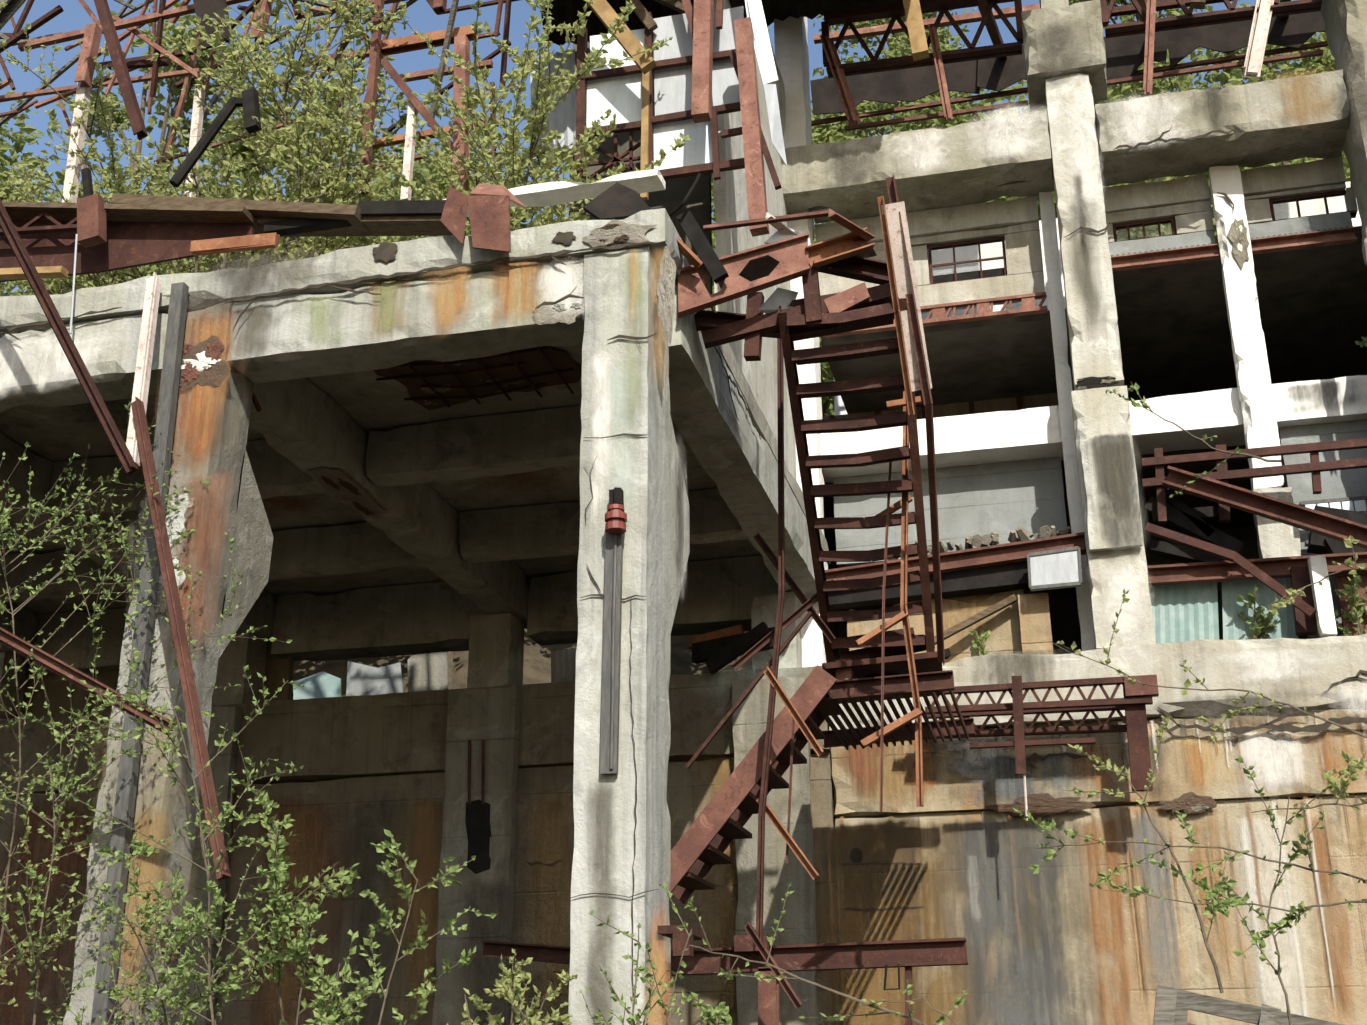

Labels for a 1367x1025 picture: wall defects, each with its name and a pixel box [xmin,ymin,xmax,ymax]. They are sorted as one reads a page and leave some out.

crack [1113,126,1234,150]
spalling [1227,218,1249,269]
spalling [551,219,676,345]
spalling [532,302,584,325]
spalling [178,335,231,394]
rust [847,739,935,796]
spalling [983,793,1096,816]
spalling [1159,791,1217,814]
rust [1306,803,1333,897]
rust [1088,810,1145,1025]
rust [1194,849,1226,941]
rust [846,968,914,1025]